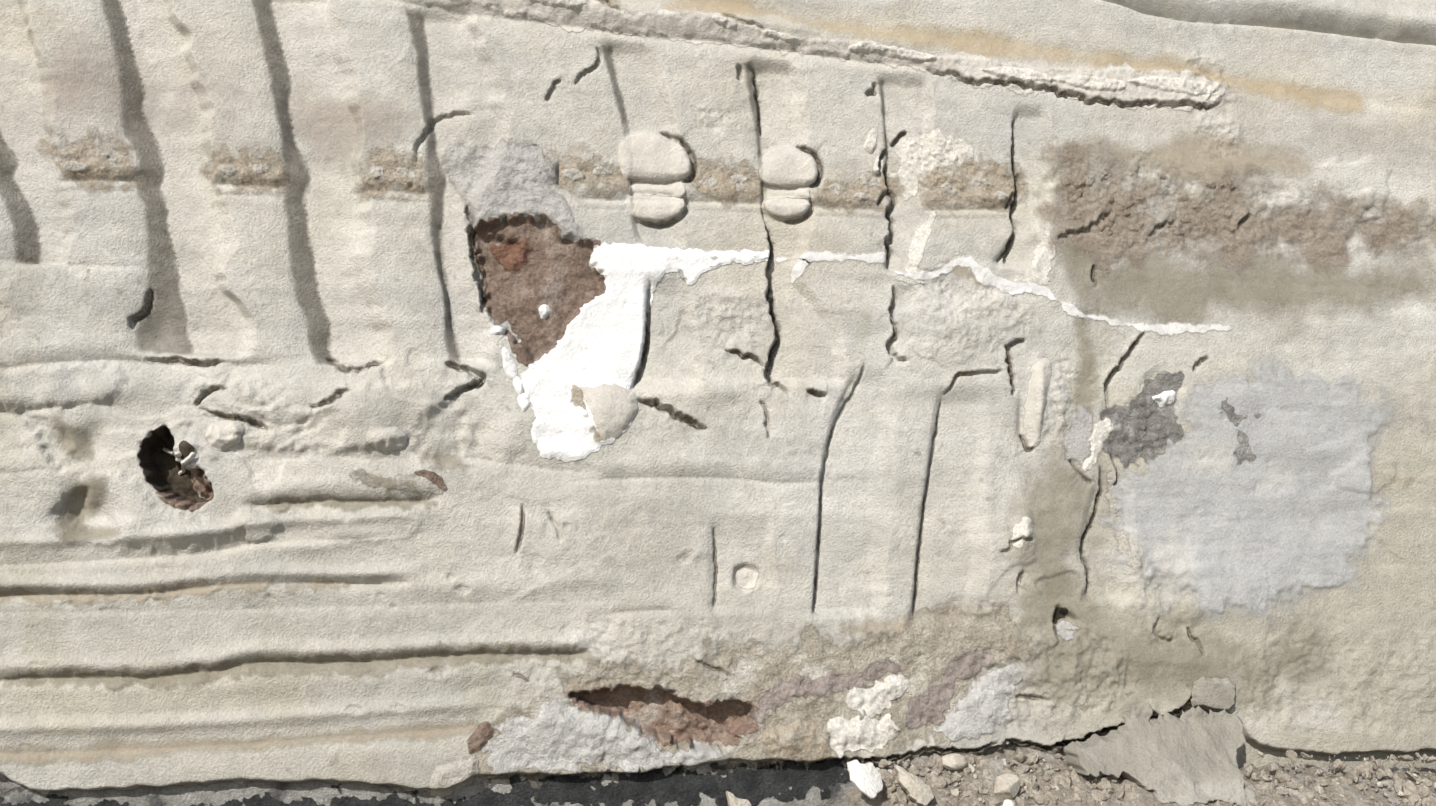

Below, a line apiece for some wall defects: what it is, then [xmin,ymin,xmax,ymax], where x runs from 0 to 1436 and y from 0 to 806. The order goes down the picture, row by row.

crack [800,147,822,218]
crack [878,132,904,260]
spalling [815,128,1028,212]
spalling [1041,145,1436,271]
spalling [179,440,195,460]
spalling [360,138,631,411]
crack [729,228,844,439]
crack [1105,338,1138,385]
spalling [1061,371,1184,471]
crack [814,480,822,603]
crack [1080,460,1117,579]
spalling [429,603,1032,799]